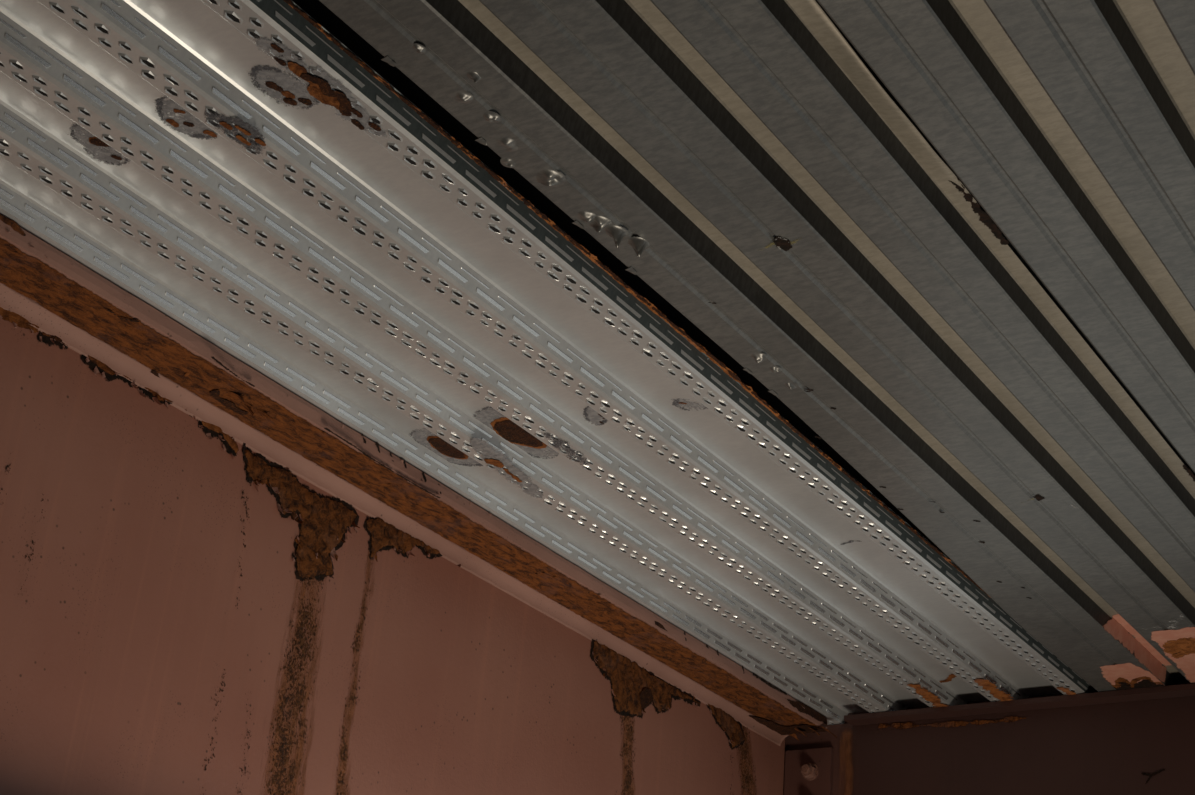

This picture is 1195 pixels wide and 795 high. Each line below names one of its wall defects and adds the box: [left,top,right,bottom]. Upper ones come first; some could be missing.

corrosion [68,124,129,166]
corrosion [155,97,266,154]
corrosion [250,37,387,137]
corrosion [283,0,992,599]
corrosion [0,238,837,795]